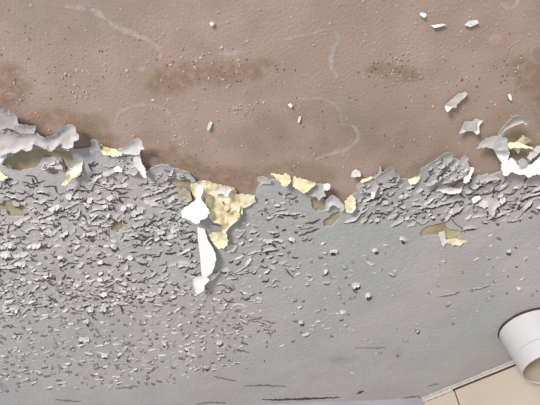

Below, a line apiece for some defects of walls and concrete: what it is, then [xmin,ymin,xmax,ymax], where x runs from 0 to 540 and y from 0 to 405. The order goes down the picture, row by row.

peeling [0,107,540,393]